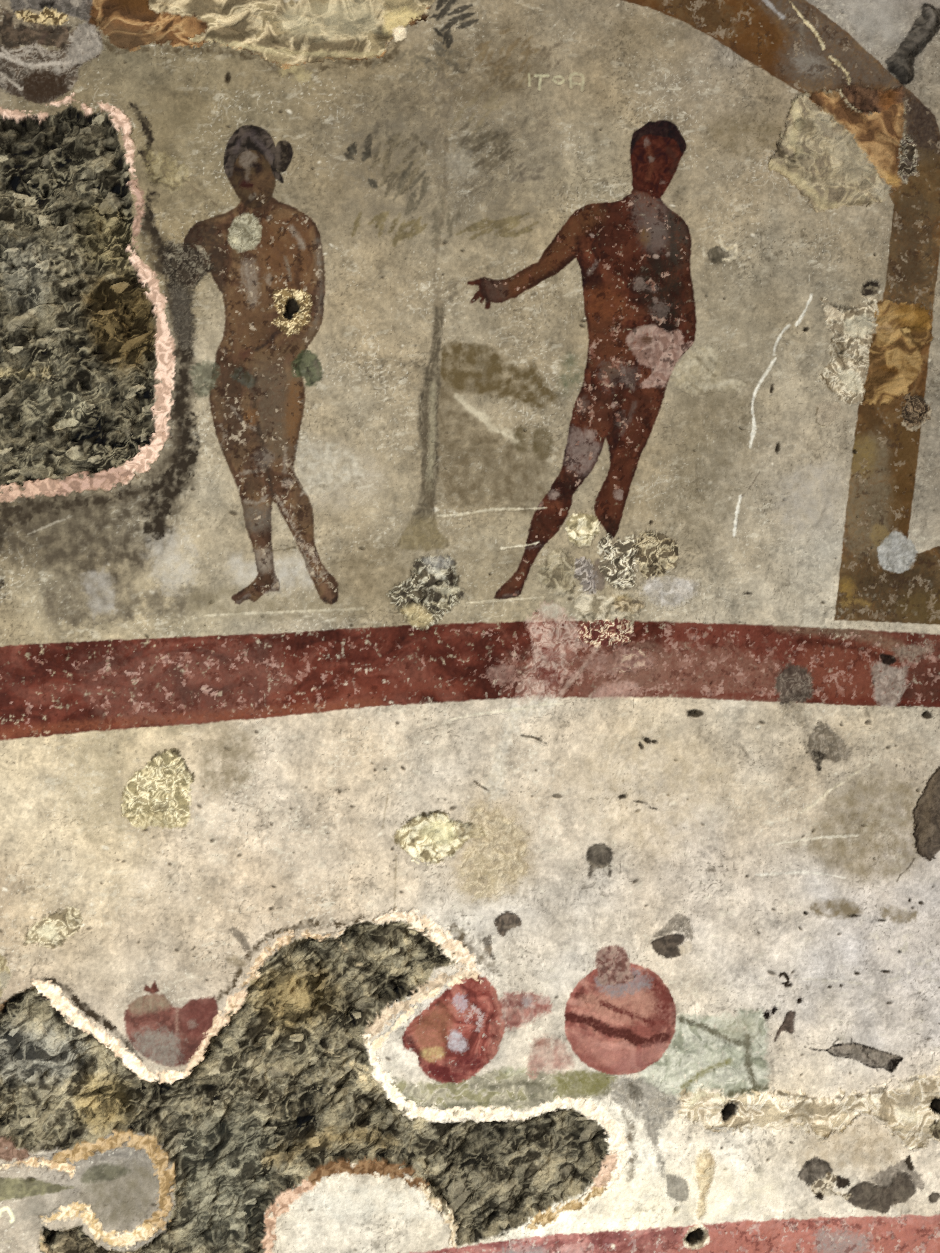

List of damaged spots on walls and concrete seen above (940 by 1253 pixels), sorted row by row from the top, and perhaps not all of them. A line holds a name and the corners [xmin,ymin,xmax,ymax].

spalling [92,0,438,70]
spalling [767,83,921,213]
flaking render [0,92,177,503]
hole [270,287,314,338]
crack [731,292,814,539]
spalling [814,279,934,432]
spalling [386,553,466,632]
spalling [535,511,701,649]
spalling [118,746,197,832]
flaking render [0,799,630,1253]